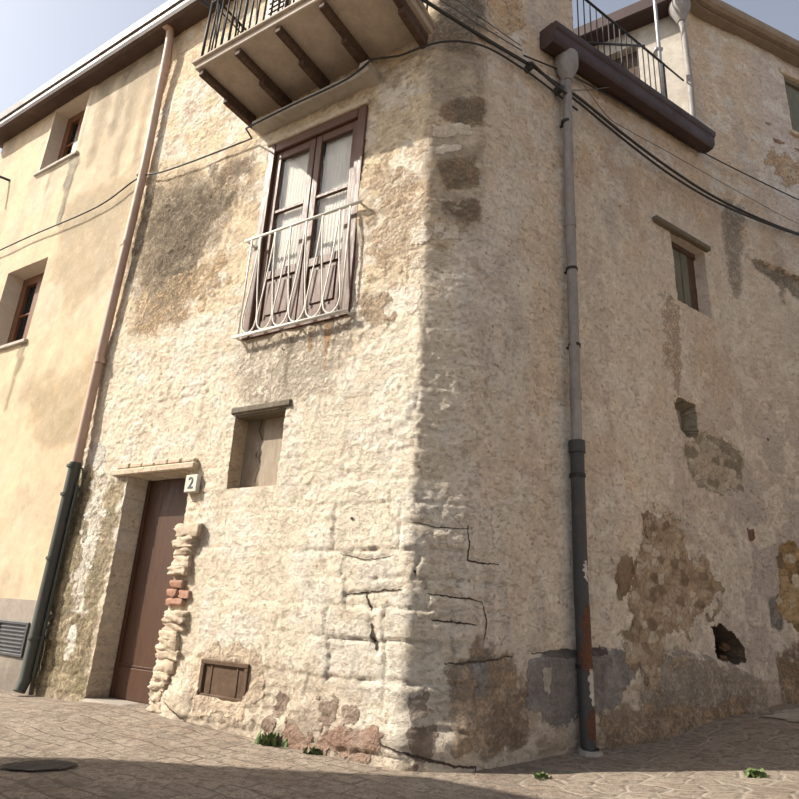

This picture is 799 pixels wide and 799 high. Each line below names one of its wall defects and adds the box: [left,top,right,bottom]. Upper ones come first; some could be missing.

damp [127,152,257,336]
spalling [684,431,744,496]
crack [407,521,499,565]
crack [347,589,402,651]
crack [428,593,512,665]
spalling [592,502,725,715]
spalling [776,540,799,632]
flaking render [187,640,265,722]
flaking render [261,691,387,764]
flaking render [406,689,438,772]
flaking render [525,648,579,729]
rust [578,604,596,741]